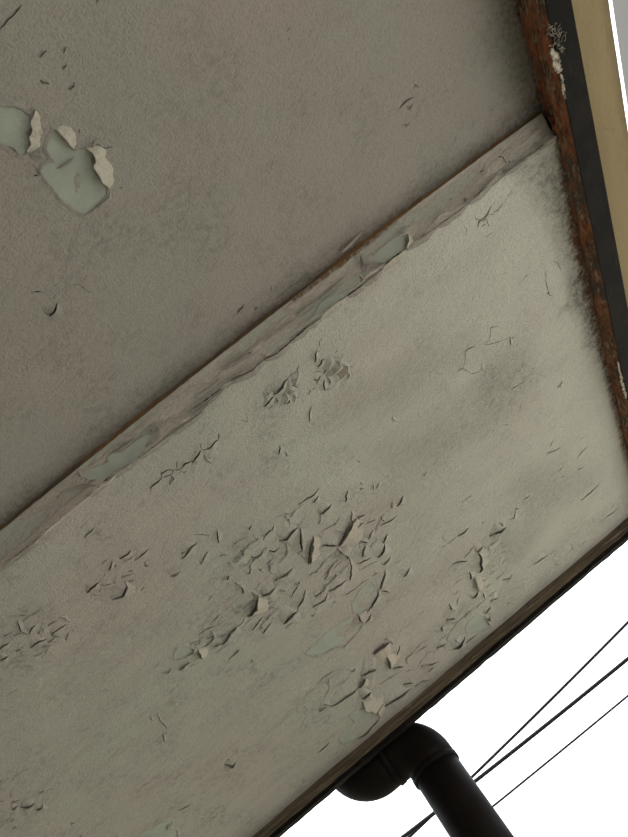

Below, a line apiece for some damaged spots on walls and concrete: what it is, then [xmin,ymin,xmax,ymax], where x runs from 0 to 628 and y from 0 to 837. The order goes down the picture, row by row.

peeling [0,100,122,219]
peeling [59,142,553,500]
crack [458,326,514,374]
rust [561,168,628,460]
peeling [0,609,71,667]
peeling [154,480,413,675]
peeling [304,493,530,753]